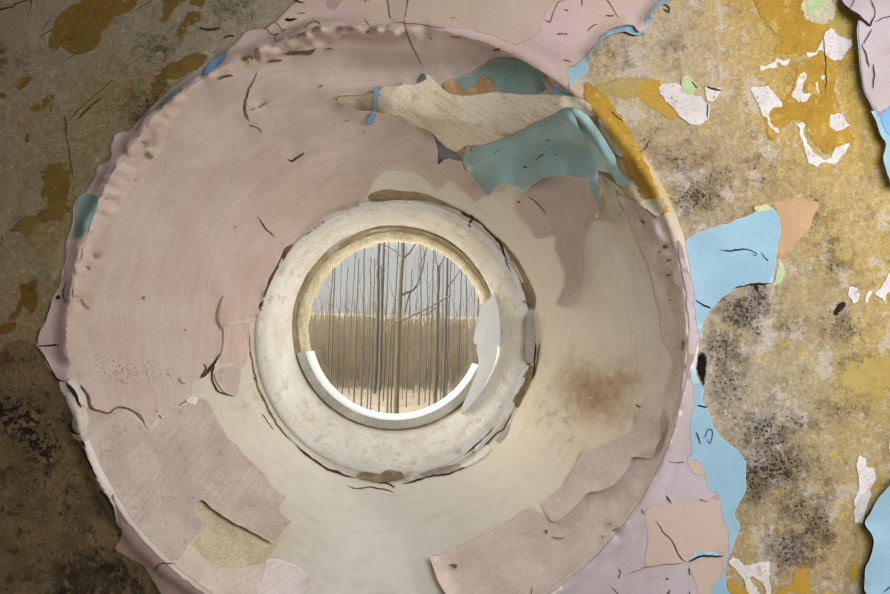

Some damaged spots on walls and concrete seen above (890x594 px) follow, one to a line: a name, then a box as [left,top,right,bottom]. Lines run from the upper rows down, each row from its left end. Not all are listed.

peeling [635,76,721,125]
peeling [751,86,782,133]
peeling [792,72,825,102]
peeling [797,0,890,179]
peeling [36,0,686,594]
leakage [727,299,759,336]
leakage [0,391,59,474]
spalling [0,341,205,594]
peeling [548,198,820,594]
leakage [696,352,707,385]
peeling [849,455,890,594]
leakage [57,548,144,594]